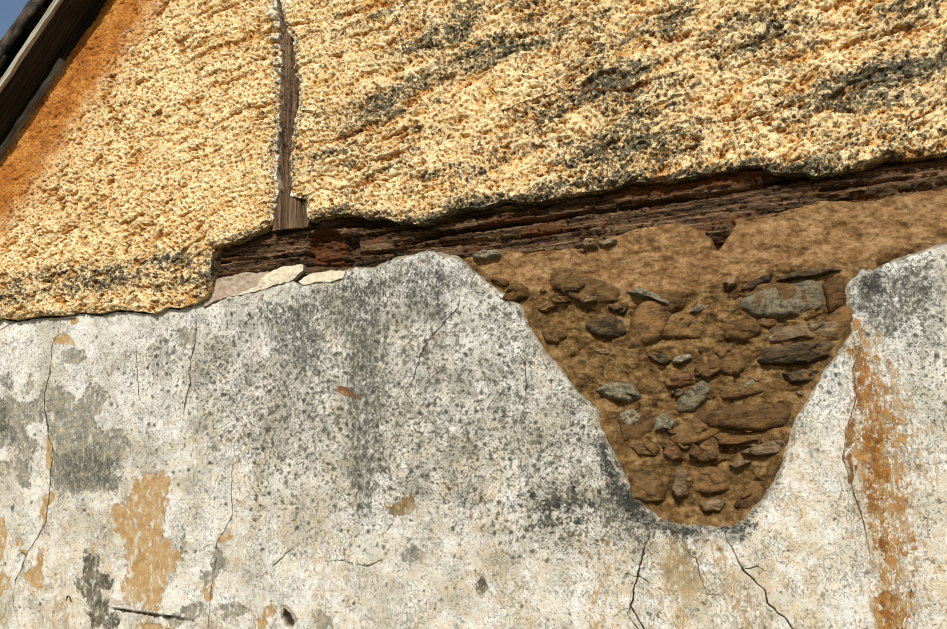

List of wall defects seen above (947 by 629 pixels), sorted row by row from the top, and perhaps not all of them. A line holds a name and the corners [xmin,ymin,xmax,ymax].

peeling [53,318,87,365]
peeling [178,326,196,349]
damp [0,371,16,440]
spalling [463,189,947,597]
damp [56,441,120,490]
crack [0,306,197,626]
peeling [0,373,294,629]
peeling [401,543,425,562]
crack [615,531,651,629]
crack [675,532,725,595]
crack [725,534,794,629]
peeling [311,610,334,629]